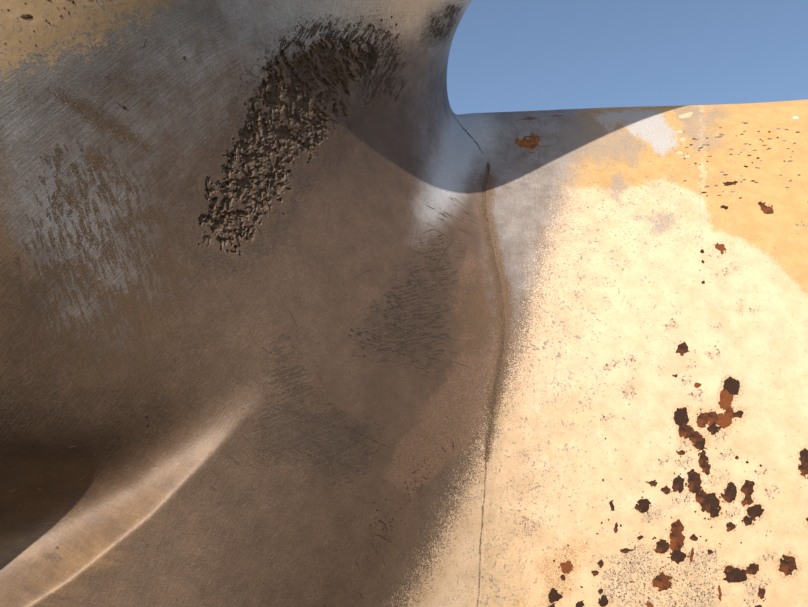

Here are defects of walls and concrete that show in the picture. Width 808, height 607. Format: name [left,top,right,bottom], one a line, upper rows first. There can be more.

spalling [182,0,467,284]
corrosion [758,200,774,214]
crack [453,115,513,607]
corrosion [674,341,690,356]
corrosion [647,372,765,532]
corrosion [795,444,808,480]
corrosion [633,496,651,514]
corrosion [507,535,604,607]
corrosion [598,589,613,607]
corrosion [651,515,701,593]
corrosion [718,560,762,601]
corrosion [776,551,802,583]